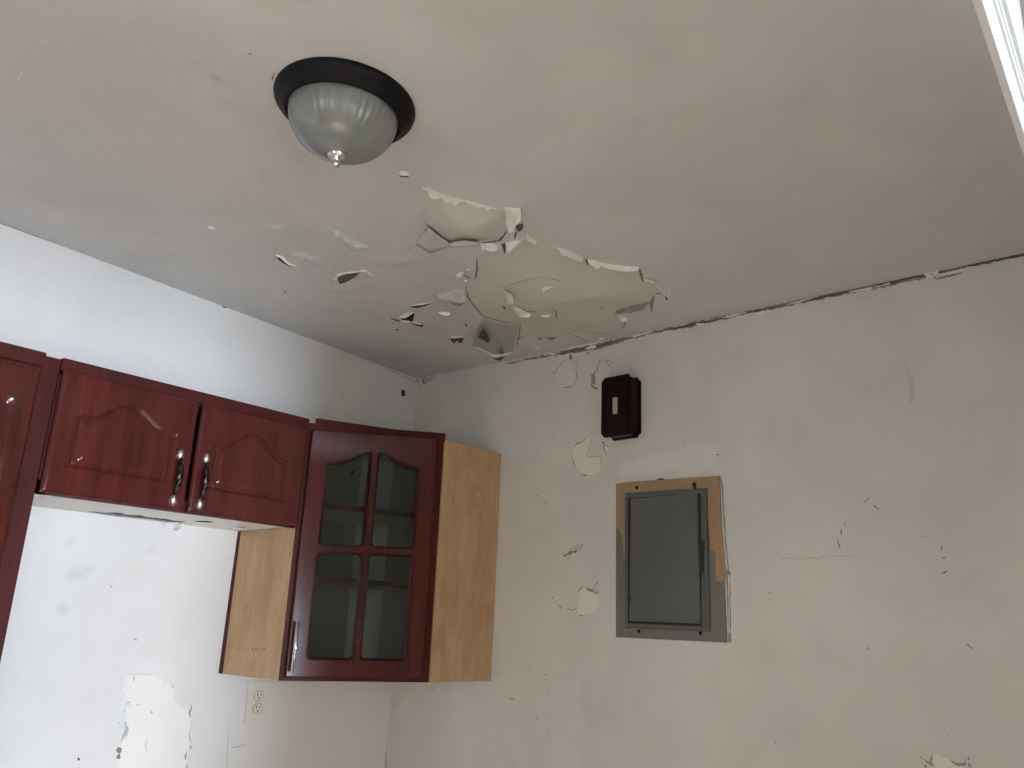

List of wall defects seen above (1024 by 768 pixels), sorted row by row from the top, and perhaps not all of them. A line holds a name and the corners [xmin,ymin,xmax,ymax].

peeling [325,270,372,284]
peeling [391,186,671,349]
crack [505,254,1024,365]
peeling [116,674,192,768]